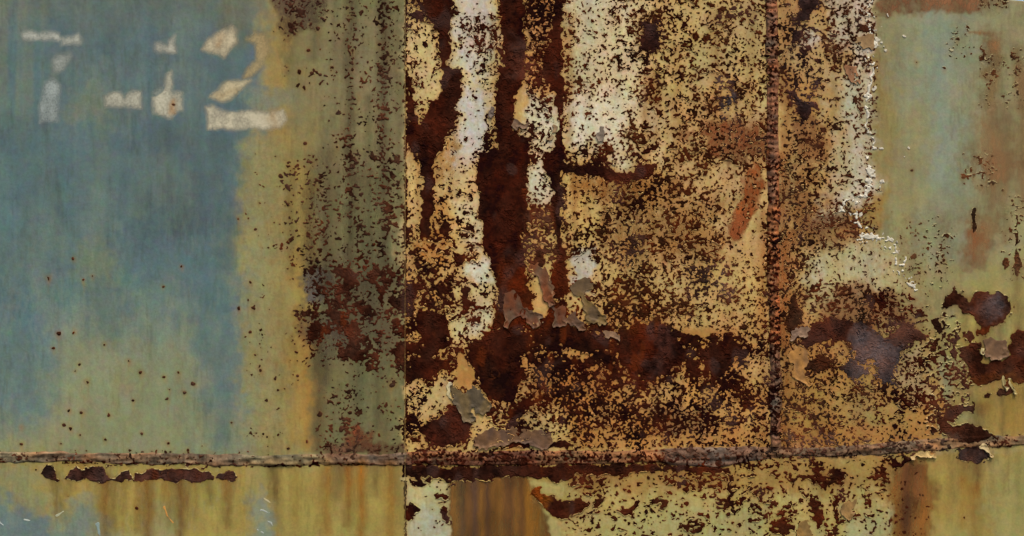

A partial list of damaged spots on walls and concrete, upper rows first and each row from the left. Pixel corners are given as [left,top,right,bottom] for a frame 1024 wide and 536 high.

rust [230,0,975,536]
spalling [339,0,934,451]
rust [961,153,1024,281]
peeling [942,287,1024,398]
rust [0,442,216,471]
peeling [910,451,937,460]
peeling [936,416,994,464]
rust [988,434,1021,448]